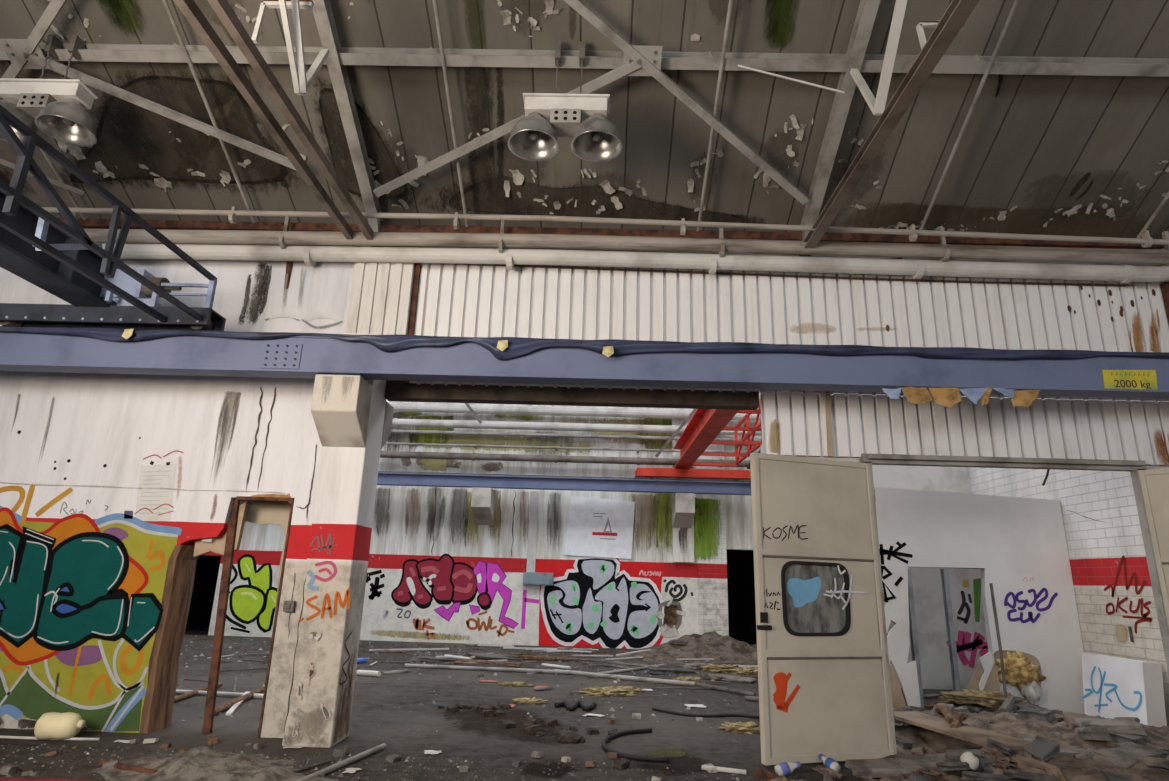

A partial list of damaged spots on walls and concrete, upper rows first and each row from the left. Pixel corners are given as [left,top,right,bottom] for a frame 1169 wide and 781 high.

peeling [497,0,561,37]
water stain [56,67,299,191]
water stain [314,78,364,204]
water stain [354,67,765,224]
peeling [774,114,813,168]
peeling [1043,187,1129,227]
rust [441,263,1160,352]
water stain [215,391,241,465]
water stain [375,488,390,531]
water stain [450,489,501,540]
water stain [654,493,708,547]